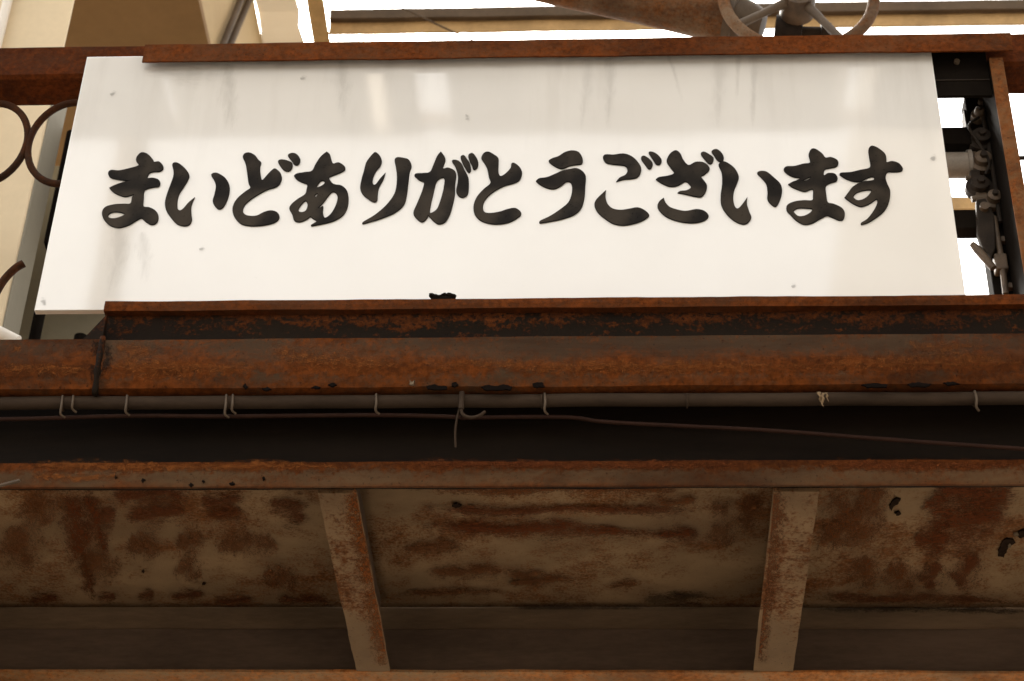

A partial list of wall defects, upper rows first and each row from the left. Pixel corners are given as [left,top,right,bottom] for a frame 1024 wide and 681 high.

rust [34,460,336,482]
rust [392,459,735,470]
rust [80,490,331,607]
rust [343,489,386,665]
rust [406,488,698,598]
rust [819,552,1019,607]